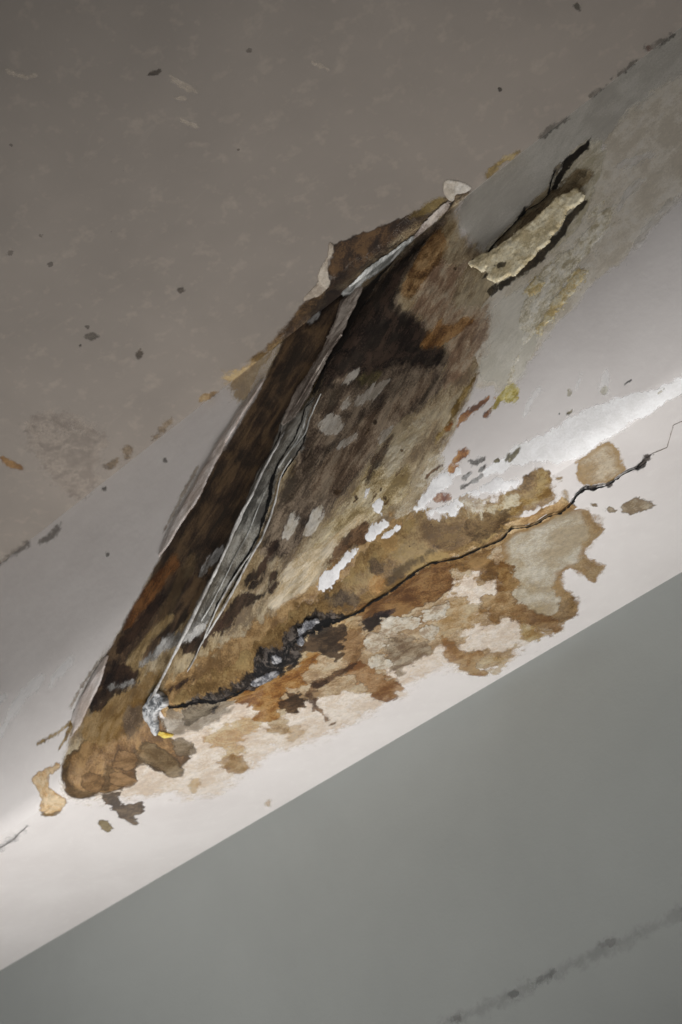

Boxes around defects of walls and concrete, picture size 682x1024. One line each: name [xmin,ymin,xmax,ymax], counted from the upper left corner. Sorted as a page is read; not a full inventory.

peeling [70,655,134,738]
leakage [26,191,656,832]
peeling [139,27,682,738]
crack [168,421,682,714]